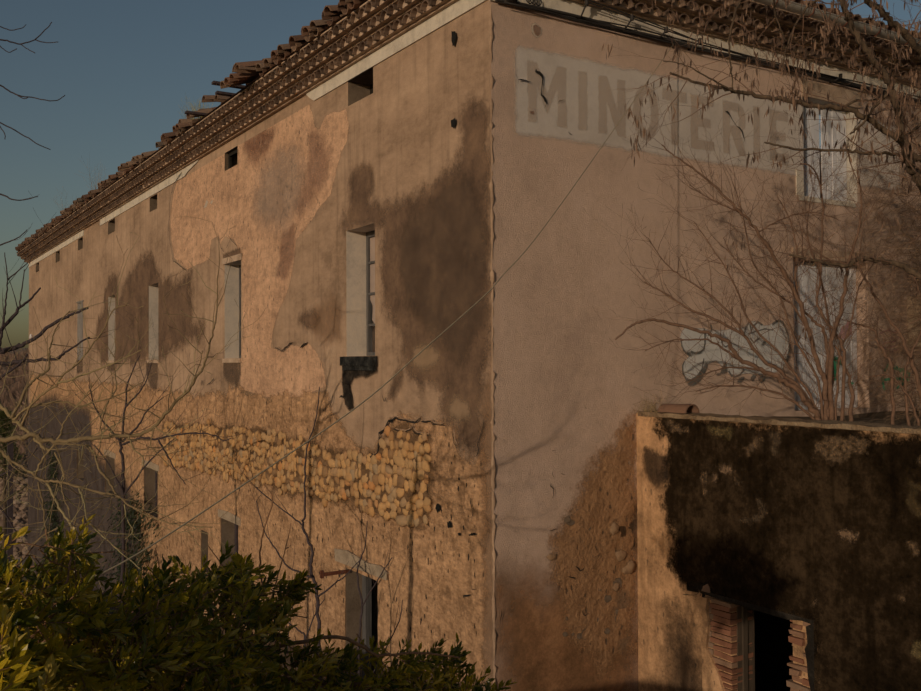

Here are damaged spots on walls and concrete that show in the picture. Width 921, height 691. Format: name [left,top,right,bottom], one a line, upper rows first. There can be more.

leakage [96,254,204,389]
flaking render [30,105,489,691]
leakage [342,102,491,454]
leakage [644,417,921,691]